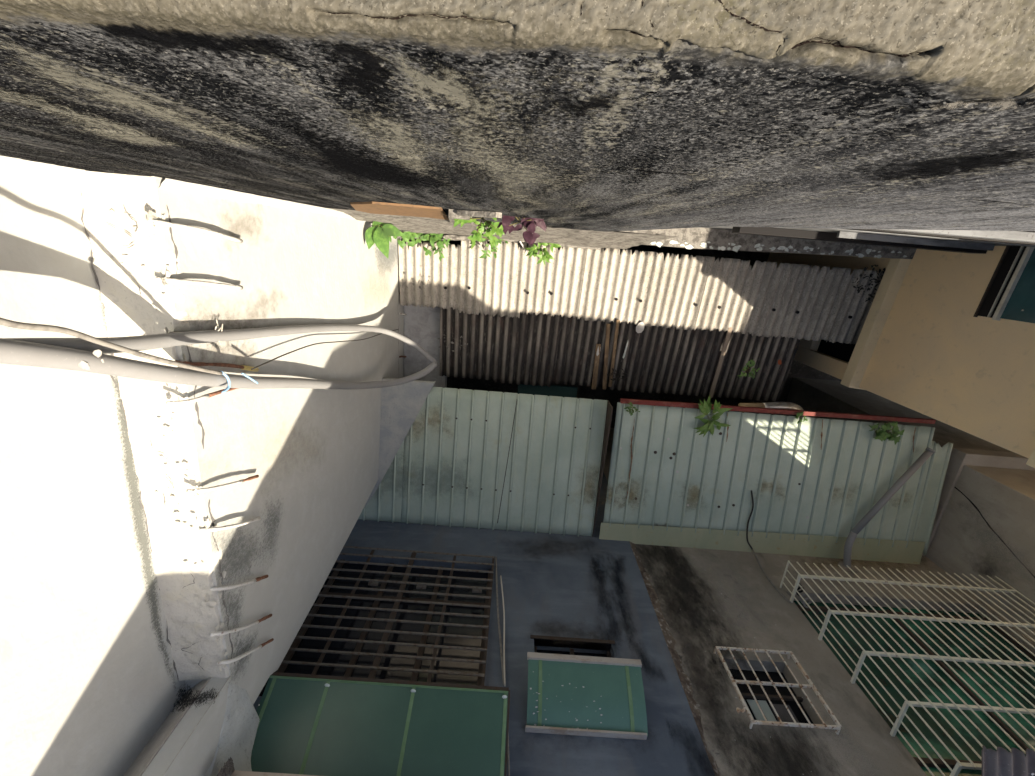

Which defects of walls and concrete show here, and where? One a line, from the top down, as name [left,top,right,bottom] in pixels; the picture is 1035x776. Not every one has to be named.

crack [314,9,510,23]
crack [719,0,930,57]
leakage [91,23,396,110]
leakage [548,91,619,118]
leakage [270,114,461,190]
leakage [841,145,1035,184]
peeling [78,350,104,370]
spalling [166,388,239,421]
spalling [186,475,259,500]
spalling [199,517,261,532]
spalling [205,571,268,602]
spalling [217,638,274,671]